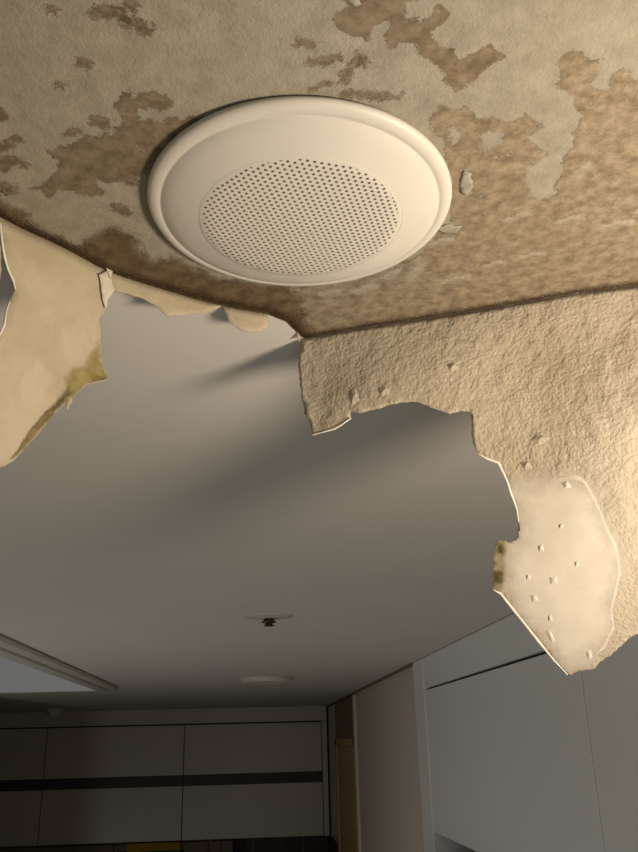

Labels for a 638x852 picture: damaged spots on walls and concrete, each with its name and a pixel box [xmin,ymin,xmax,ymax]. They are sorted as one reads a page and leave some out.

peeling [87,0,157,38]
peeling [0,90,205,217]
damp [0,199,638,338]
damp [13,351,106,457]